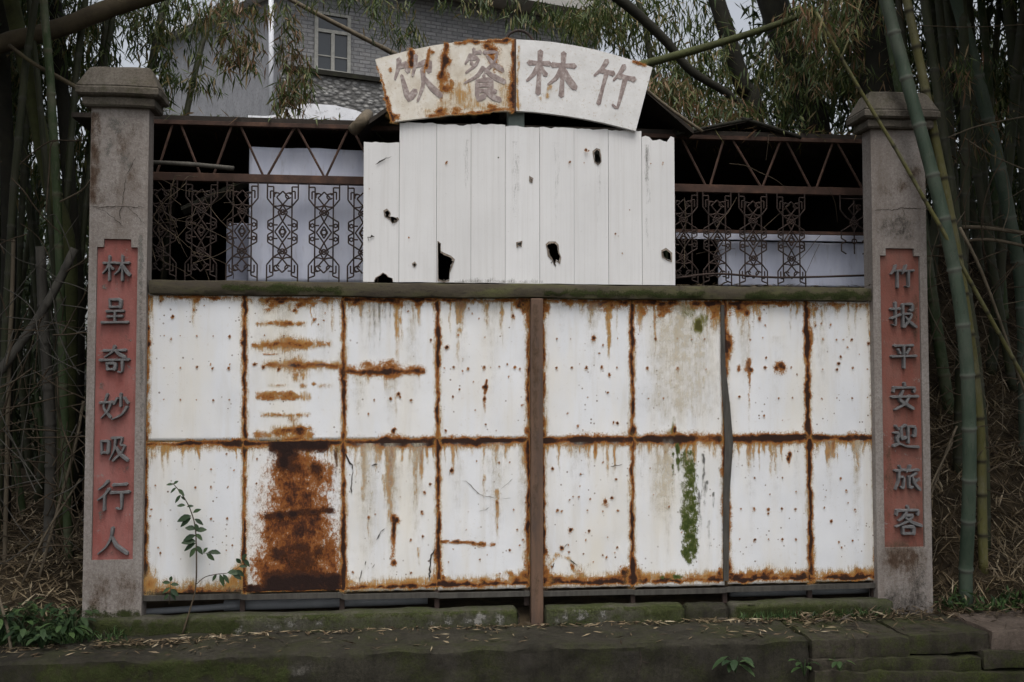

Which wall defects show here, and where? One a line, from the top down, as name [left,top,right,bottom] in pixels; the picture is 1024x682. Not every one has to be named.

rust [376,67,400,123]
rust [407,37,521,117]
rust [143,295,874,595]